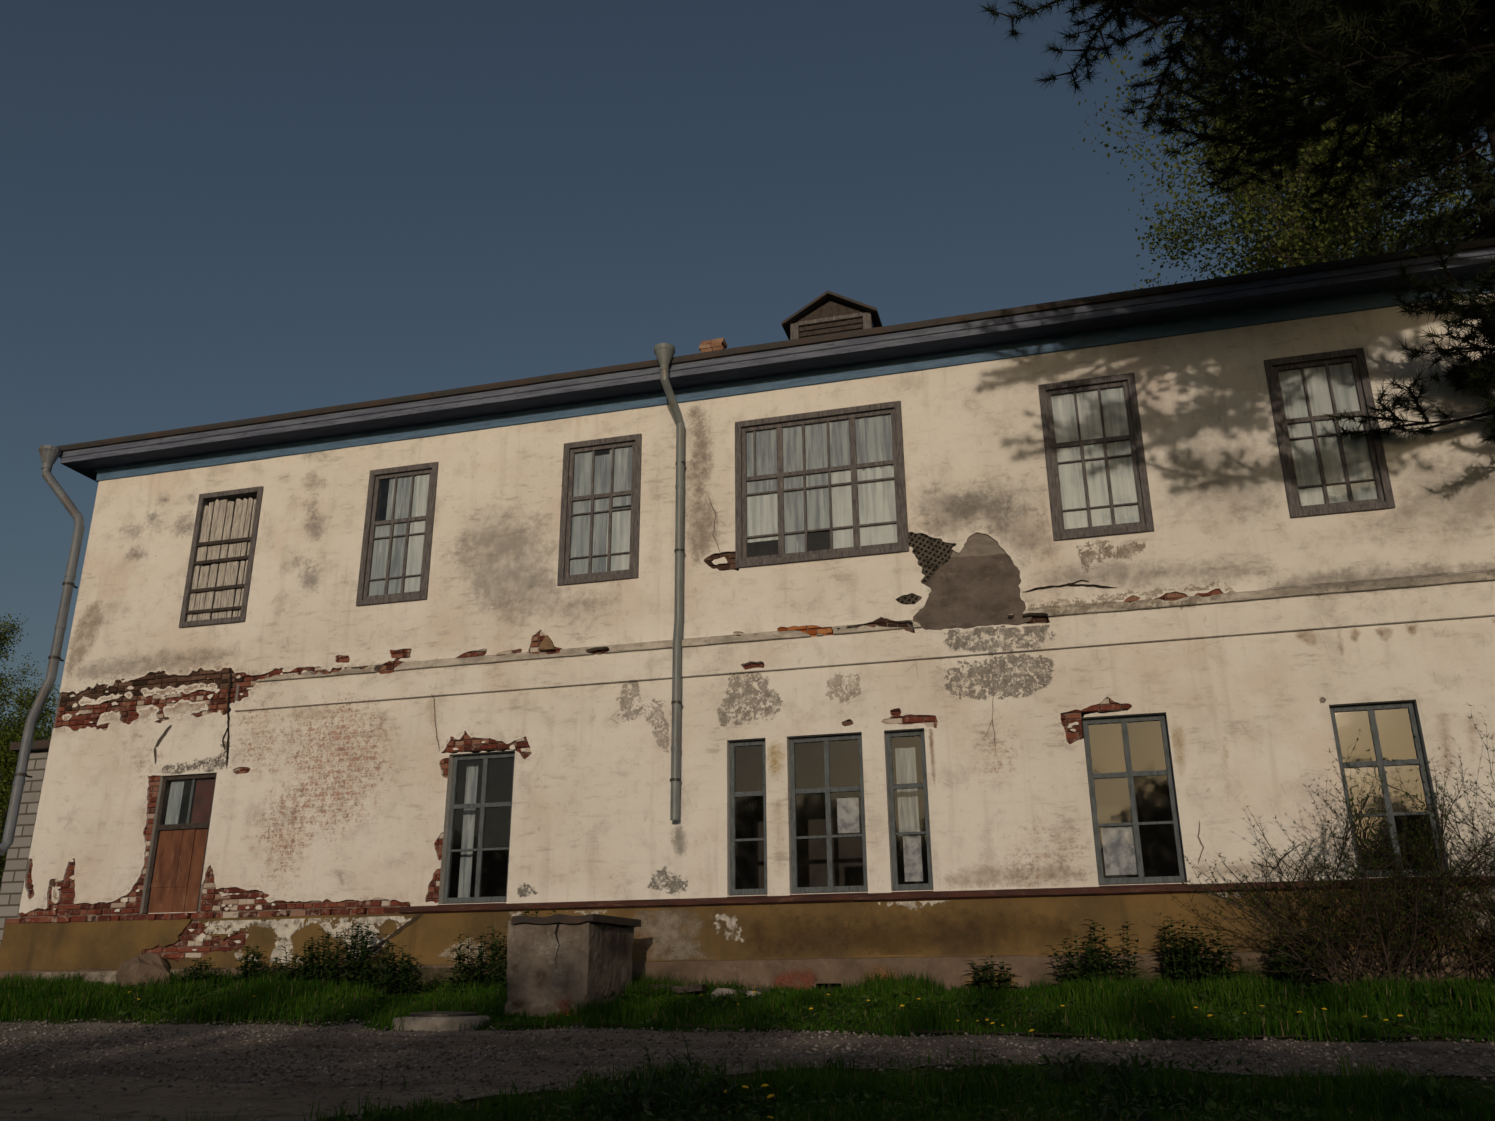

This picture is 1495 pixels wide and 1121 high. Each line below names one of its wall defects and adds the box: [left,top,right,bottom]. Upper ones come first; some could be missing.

flaking render [704,552,739,571]
flaking render [778,625,834,637]
flaking render [855,533,1236,700]
flaking render [55,649,427,732]
peeling [717,663,783,726]
flaking render [1060,697,1132,744]
flaking render [440,731,531,778]
flaking render [20,740,250,918]
flaking render [143,833,443,965]